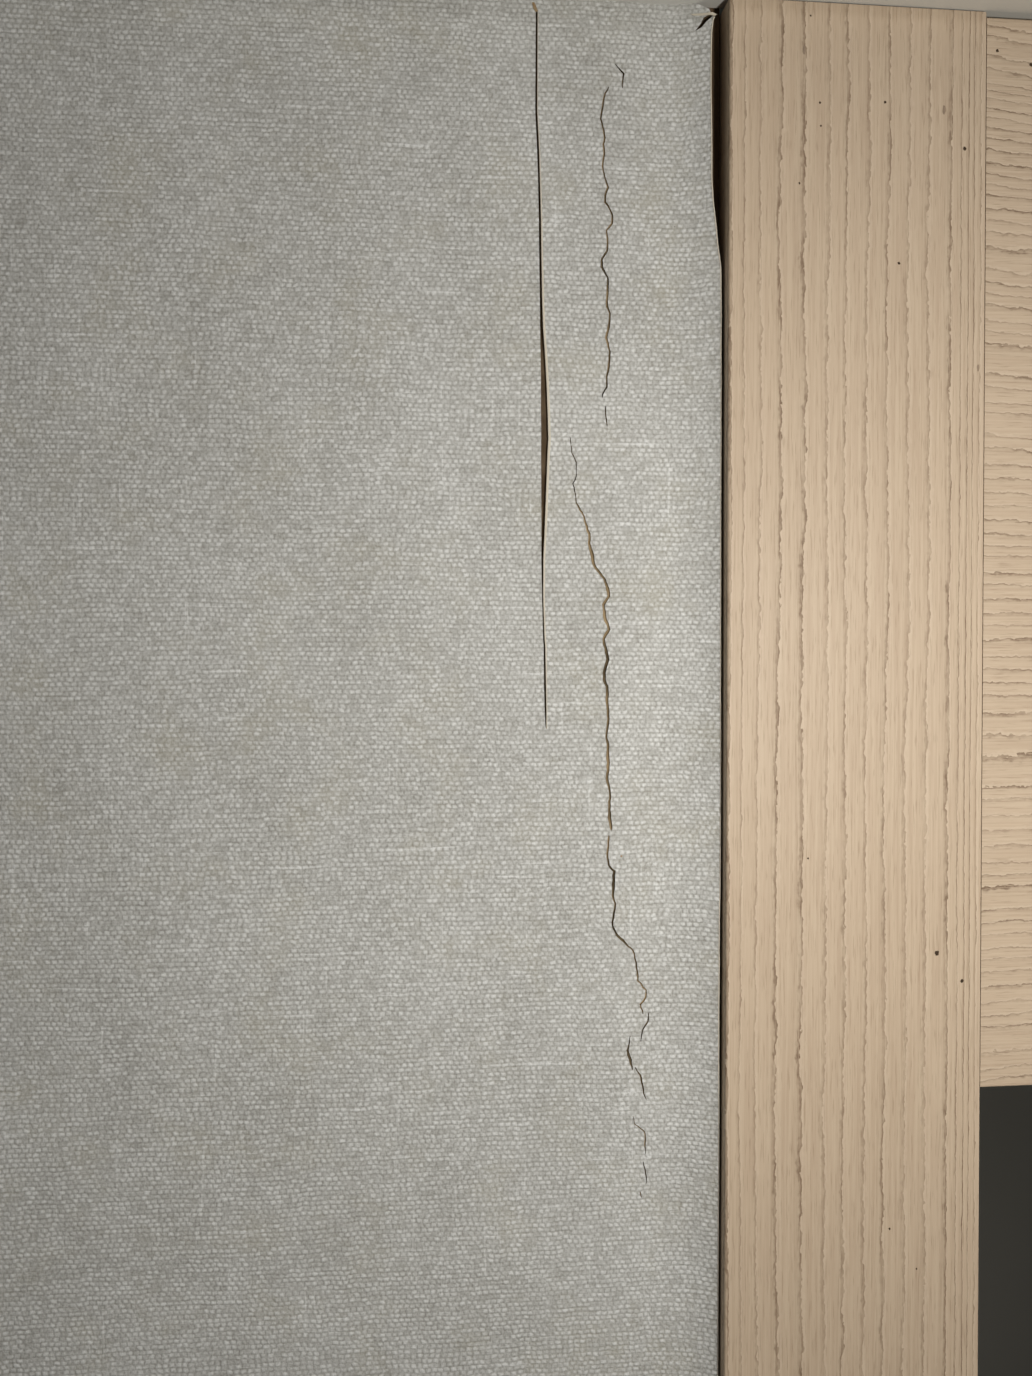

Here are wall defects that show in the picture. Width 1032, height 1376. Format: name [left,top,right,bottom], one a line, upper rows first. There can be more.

crack [600,64,625,431]
crack [570,438,649,1198]